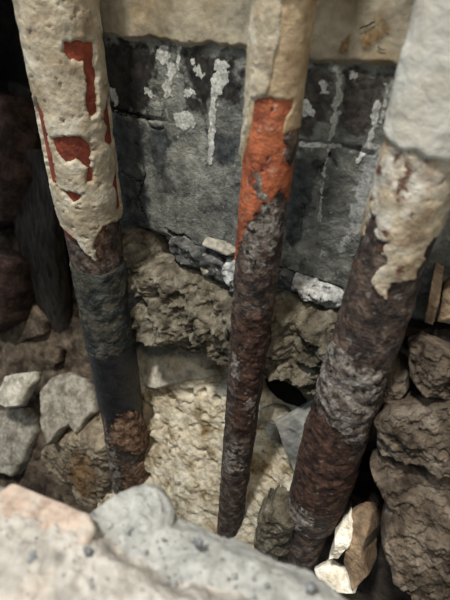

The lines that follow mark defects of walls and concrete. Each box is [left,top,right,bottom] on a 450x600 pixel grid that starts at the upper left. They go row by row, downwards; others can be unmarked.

leakage [180,48,245,115]
leakage [300,64,333,138]
leakage [341,66,391,135]
leakage [205,129,237,165]
leakage [285,147,330,246]
leakage [338,143,382,253]
rust [94,224,109,263]